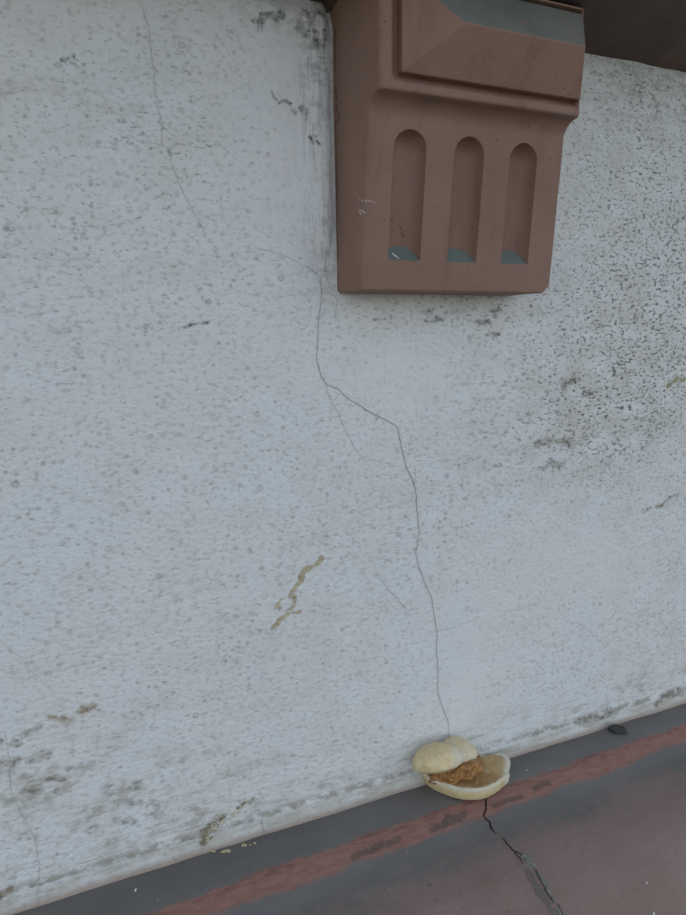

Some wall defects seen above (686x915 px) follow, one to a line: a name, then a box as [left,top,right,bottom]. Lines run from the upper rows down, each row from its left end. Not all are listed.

crack [97,8,211,237]
crack [321,29,340,129]
crack [256,162,477,738]
damp [200,798,254,846]
crack [483,798,563,915]